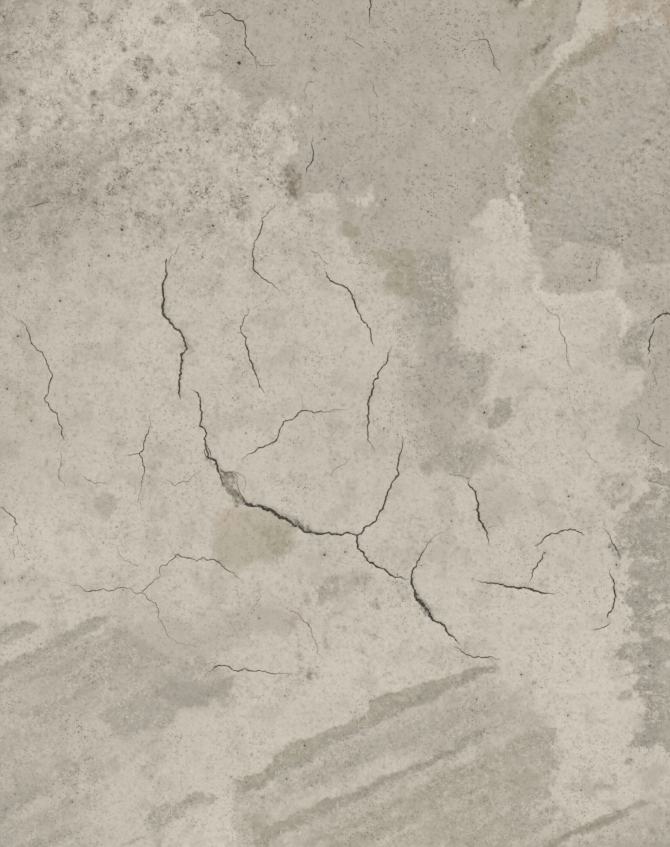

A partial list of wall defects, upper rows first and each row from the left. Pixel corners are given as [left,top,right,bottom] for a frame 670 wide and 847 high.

crack [205,0,271,68]
crack [252,202,288,288]
crack [12,315,65,482]
crack [161,231,497,660]
water stain [0,613,118,676]
crack [58,553,290,680]
crack [477,527,621,630]
water stain [153,675,241,709]
water stain [227,662,563,847]
water stain [0,755,83,847]
water stain [120,790,217,847]
water stain [540,759,670,847]